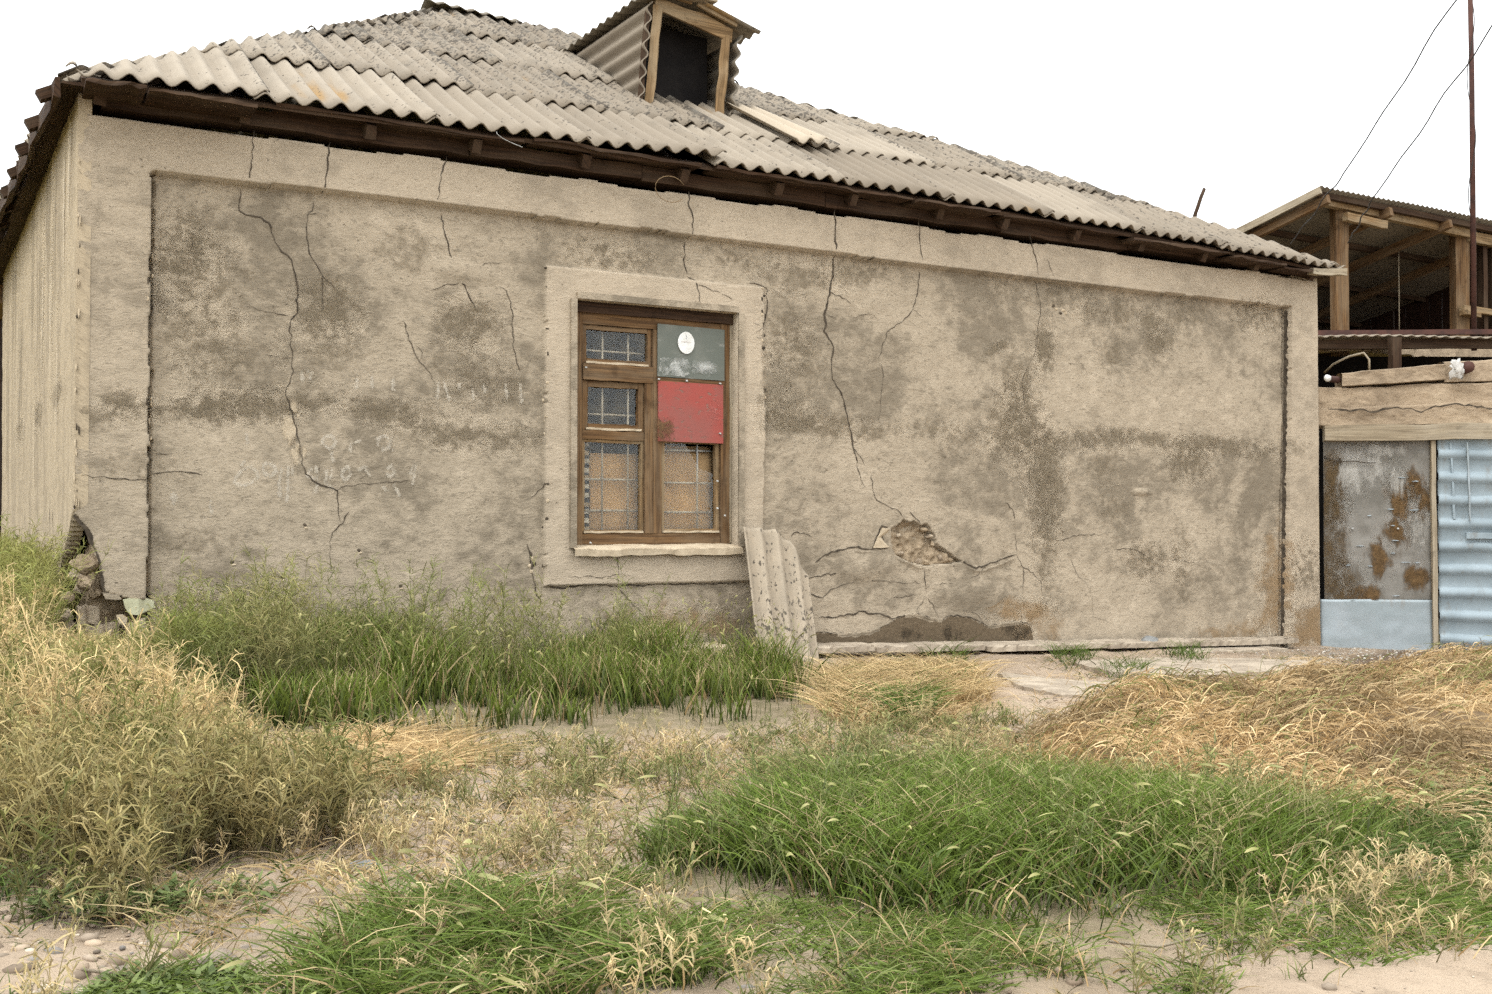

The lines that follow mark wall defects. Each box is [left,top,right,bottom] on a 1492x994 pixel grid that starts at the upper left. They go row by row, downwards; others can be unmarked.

crack [238,134,409,569]
crack [792,210,1043,638]
spalling [873,521,958,565]
rust [1324,453,1430,600]
damp [816,600,1055,643]